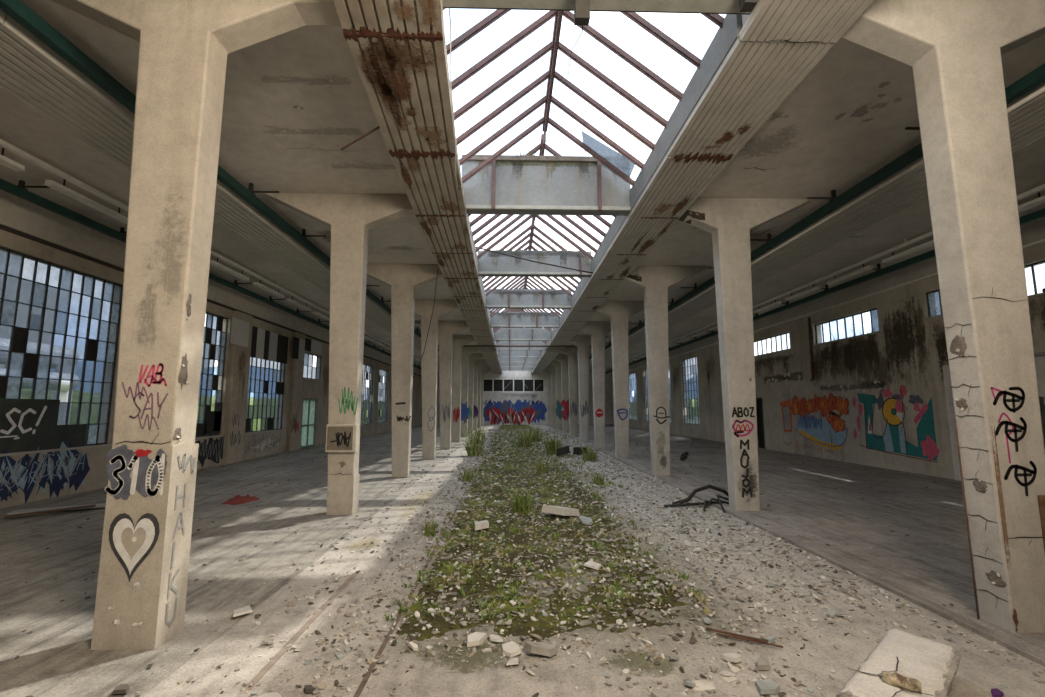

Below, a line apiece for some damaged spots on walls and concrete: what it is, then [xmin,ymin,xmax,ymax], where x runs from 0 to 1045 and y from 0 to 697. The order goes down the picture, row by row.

rust [343,0,457,186]
rust [672,126,749,164]
leakage [814,299,949,391]
crack [950,384,984,418]
crack [967,514,1043,565]